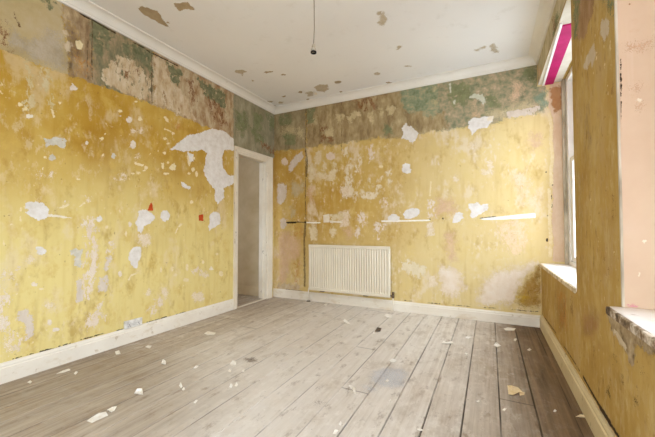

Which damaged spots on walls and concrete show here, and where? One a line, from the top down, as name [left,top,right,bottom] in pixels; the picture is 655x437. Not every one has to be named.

peeling [0,0,594,262]
leakage [401,227,468,299]
leakage [473,261,542,313]